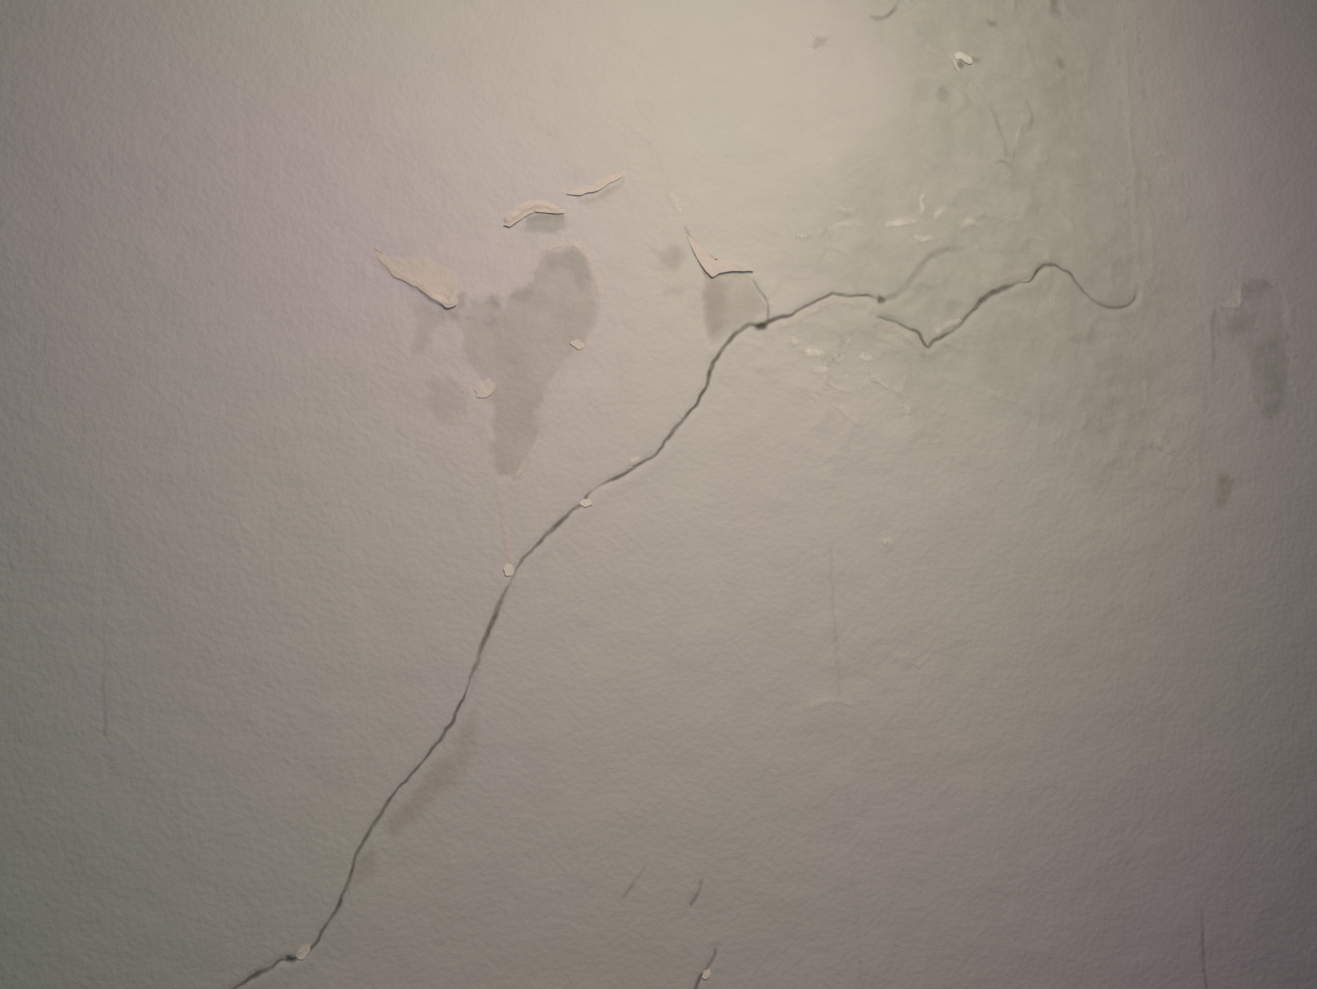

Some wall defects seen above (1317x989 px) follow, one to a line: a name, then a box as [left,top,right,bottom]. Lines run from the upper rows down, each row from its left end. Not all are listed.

crack [935,291,995,338]
crack [613,315,791,480]
crack [504,499,592,576]
crack [289,943,311,959]
crack [700,968,711,979]